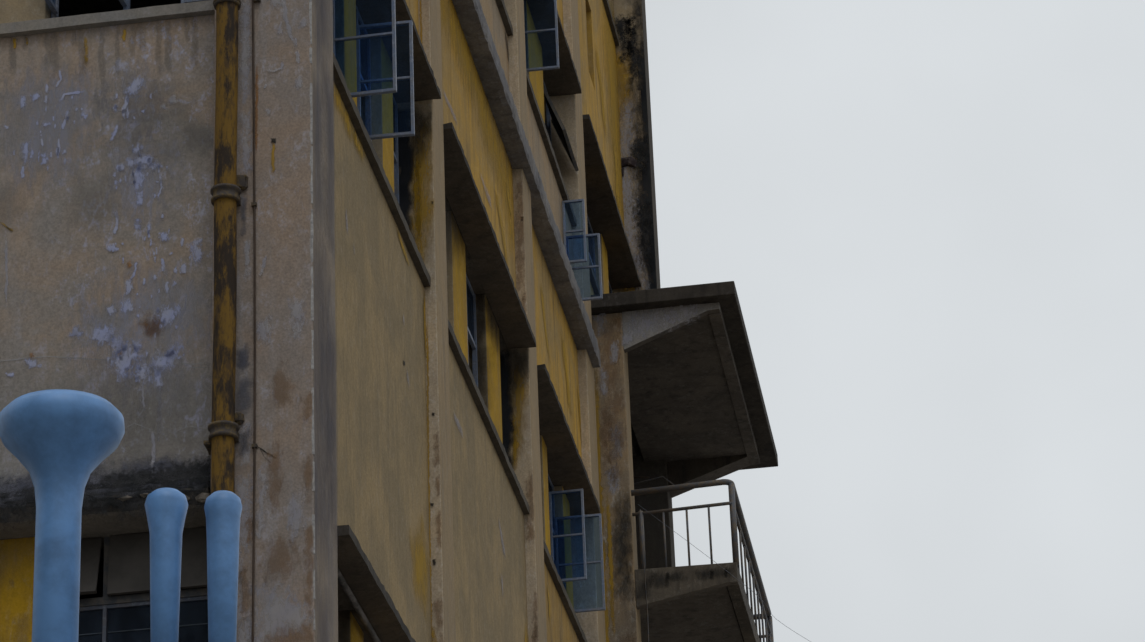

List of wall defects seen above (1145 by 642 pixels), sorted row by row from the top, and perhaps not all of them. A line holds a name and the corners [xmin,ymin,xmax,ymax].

peeling [70,76,204,391]
water stain [596,1,657,291]
water stain [0,478,36,528]
water stain [82,385,211,519]